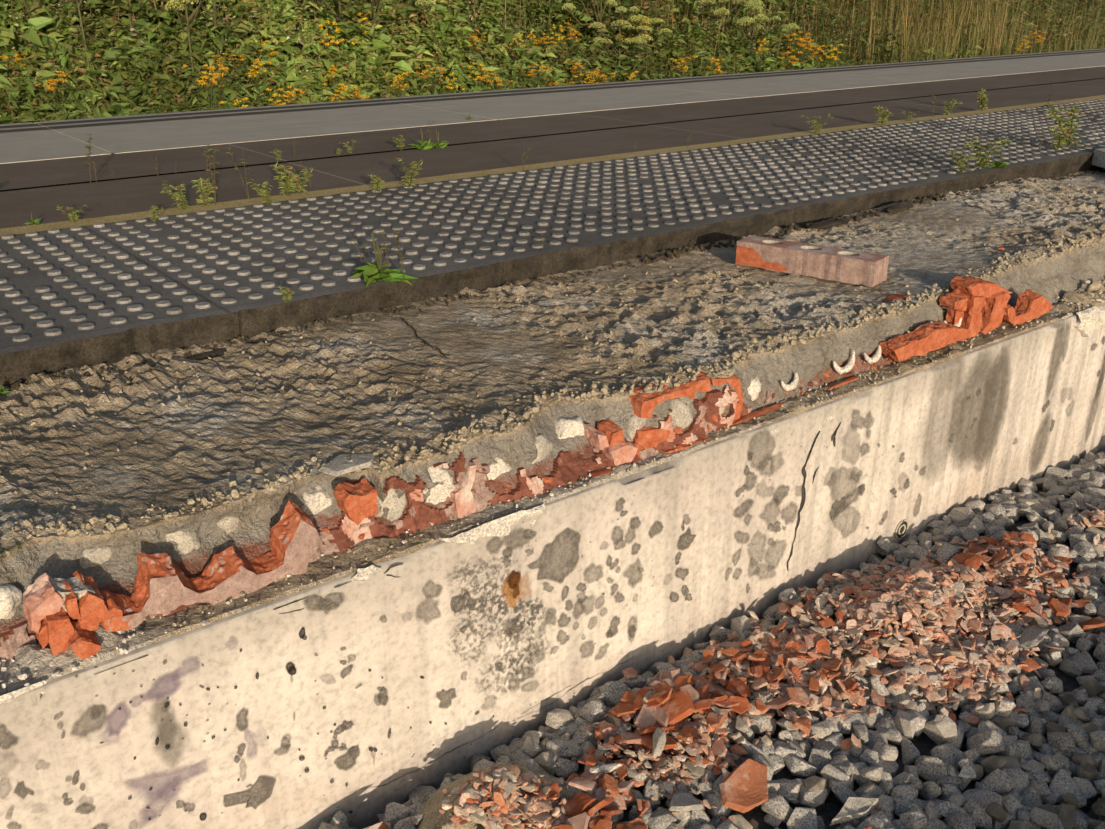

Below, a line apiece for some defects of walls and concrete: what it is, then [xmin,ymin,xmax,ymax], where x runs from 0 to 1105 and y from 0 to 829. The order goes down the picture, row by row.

water stain [949,348,1009,462]
crack [787,422,841,571]
rust [503,571,521,607]